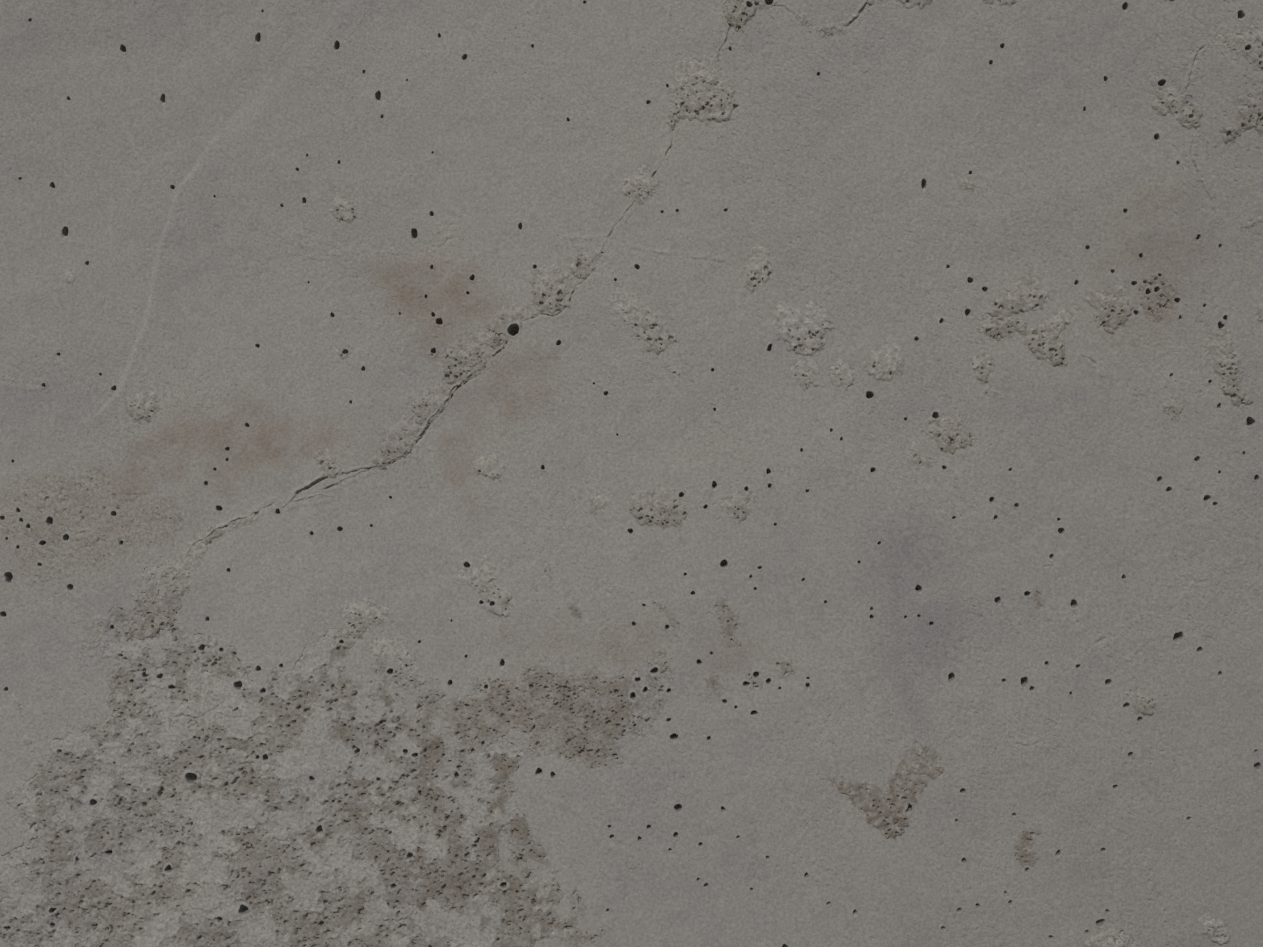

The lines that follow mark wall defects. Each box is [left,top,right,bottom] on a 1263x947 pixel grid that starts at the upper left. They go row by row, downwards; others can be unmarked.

crack [704,0,933,83]
crack [982,0,1035,8]
spalling [663,55,740,133]
crack [124,112,684,642]
spalling [772,299,836,391]
spalling [968,271,1176,384]
spalling [627,481,689,531]
spalling [455,554,513,618]
spalling [0,565,675,947]
spalling [828,735,946,843]